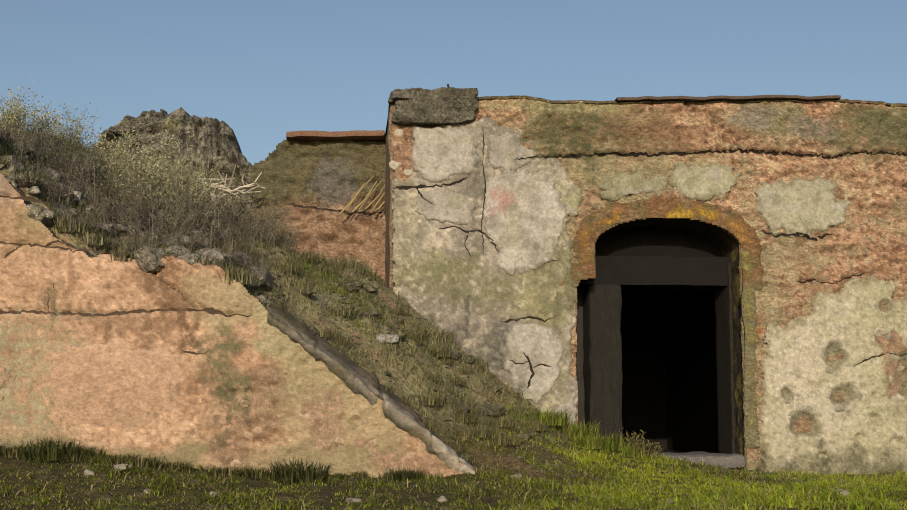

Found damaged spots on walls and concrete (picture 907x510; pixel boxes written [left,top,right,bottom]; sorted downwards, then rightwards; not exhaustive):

crack [516,148,907,160]
crack [394,124,499,257]
crack [0,195,60,205]
crack [286,203,383,215]
crack [761,230,831,241]
crack [0,240,134,258]
crack [0,256,252,317]
crack [501,315,555,323]
crack [853,352,907,367]
crack [510,352,551,389]
flaking render [755,274,907,475]